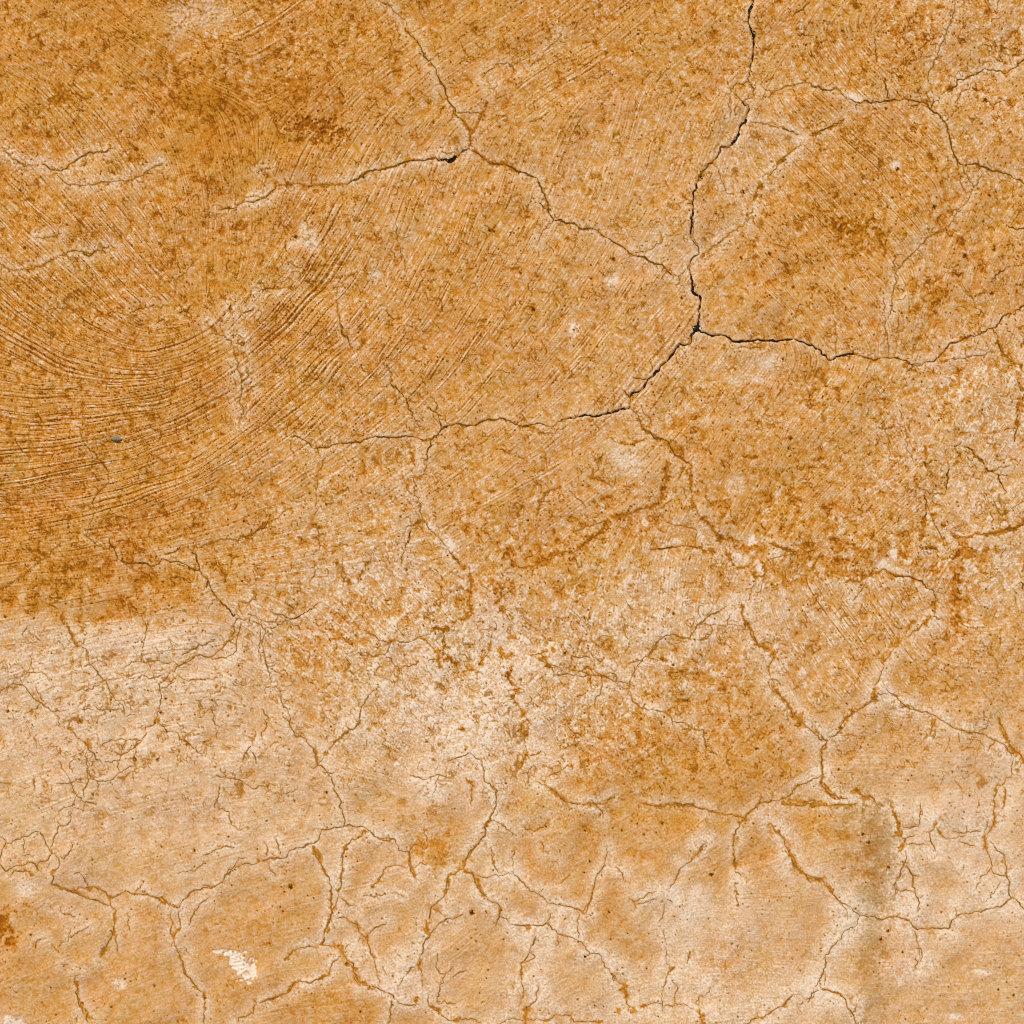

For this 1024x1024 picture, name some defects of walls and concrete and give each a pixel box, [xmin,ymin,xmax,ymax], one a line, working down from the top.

crack [0,130,177,217]
crack [0,219,306,442]
crack [0,415,352,1024]
crack [206,0,1024,1024]